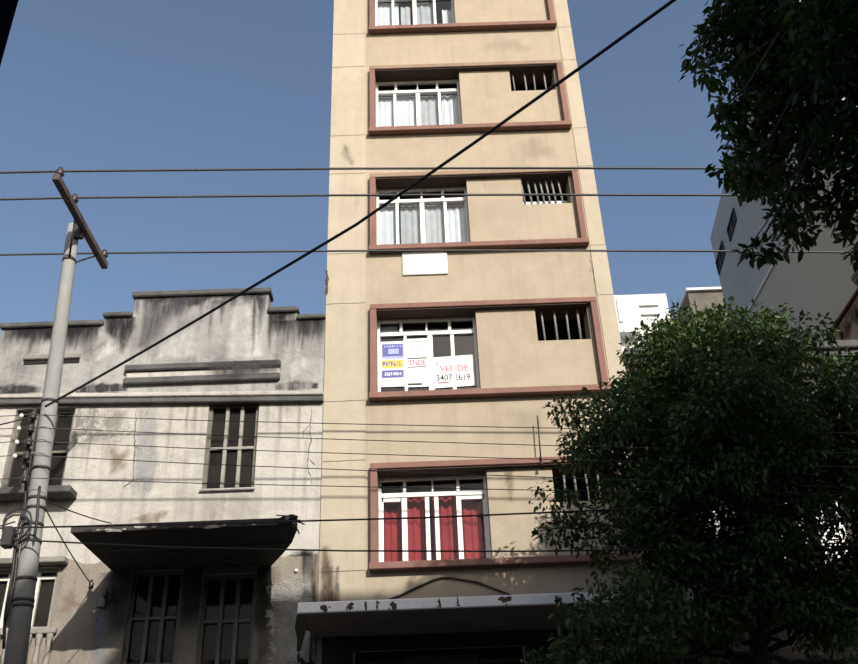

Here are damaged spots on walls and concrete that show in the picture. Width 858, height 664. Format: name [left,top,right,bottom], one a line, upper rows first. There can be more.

water stain [0,384,37,394]
water stain [12,327,53,341]
water stain [75,383,127,393]
water stain [66,294,323,377]
water stain [276,357,318,390]
crack [121,408,142,492]
crack [303,407,315,484]
spalling [265,574,331,664]